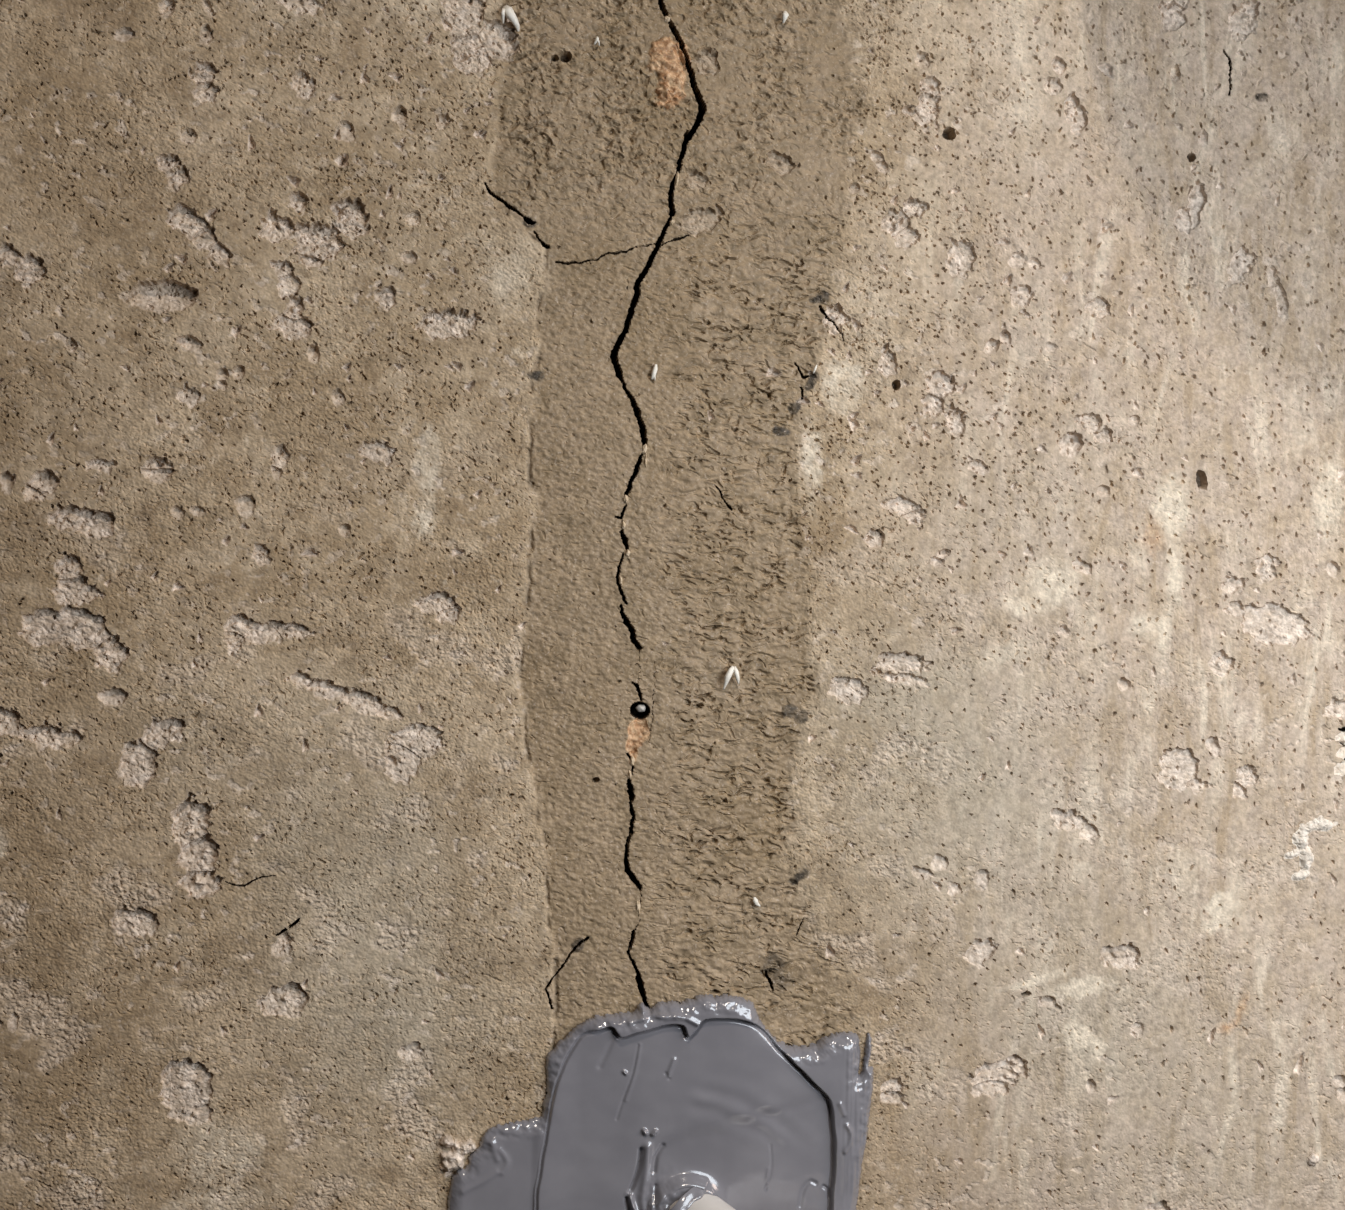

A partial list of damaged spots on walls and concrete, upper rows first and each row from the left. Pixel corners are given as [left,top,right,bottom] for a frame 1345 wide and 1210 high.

corrosion [646,35,695,111]
crack [484,0,707,1009]
corrosion [624,717,651,769]